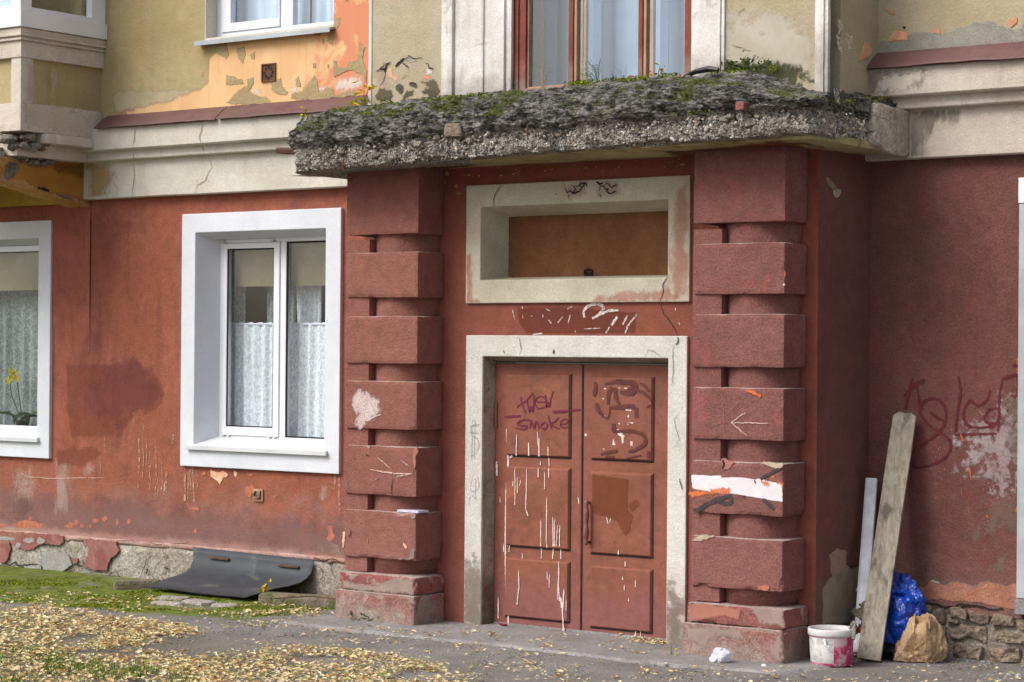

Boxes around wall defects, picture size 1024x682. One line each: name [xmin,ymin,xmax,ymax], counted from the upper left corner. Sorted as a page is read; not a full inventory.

peeling [113,0,369,114]
spalling [836,17,1024,60]
spalling [0,132,59,180]
crack [645,278,679,383]
peeling [0,516,131,571]
peeling [917,579,1017,609]